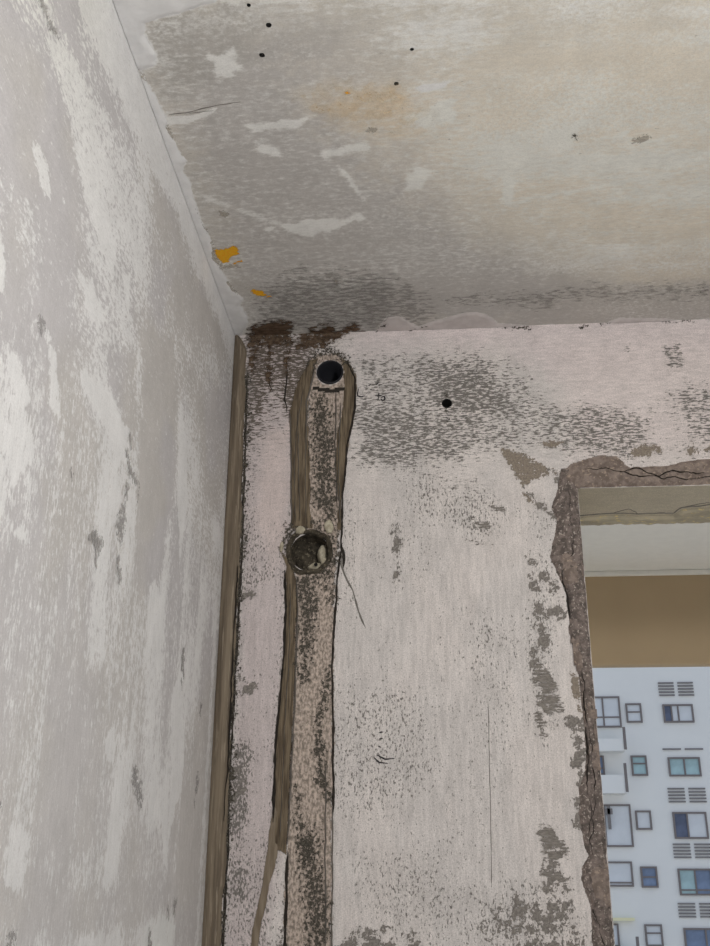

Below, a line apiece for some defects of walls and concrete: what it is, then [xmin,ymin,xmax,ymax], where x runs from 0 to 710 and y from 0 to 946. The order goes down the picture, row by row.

leakage [246,320,366,391]